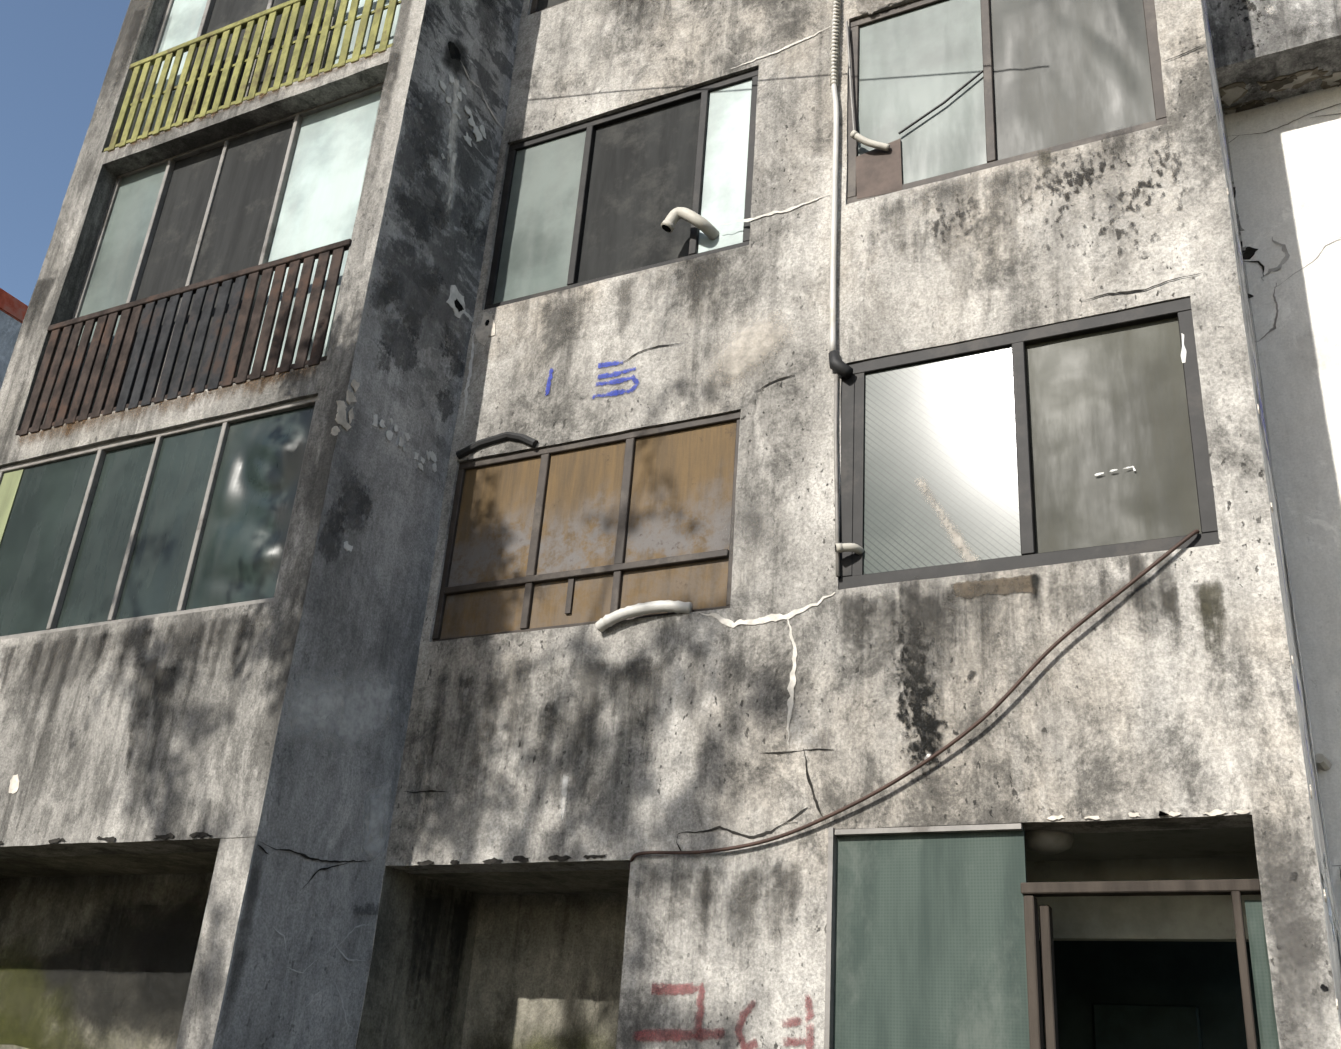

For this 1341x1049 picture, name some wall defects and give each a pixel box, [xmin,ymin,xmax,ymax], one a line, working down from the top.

leakage [448,79,459,204]
peeling [428,74,486,176]
peeling [331,379,360,436]
peeling [372,414,437,472]
peeling [446,285,465,318]
leakage [463,311,475,424]
peeling [475,312,496,346]
crack [1244,237,1341,342]
leakage [843,597,871,636]
crack [676,592,835,851]
leakage [891,581,948,782]
crack [257,842,364,890]